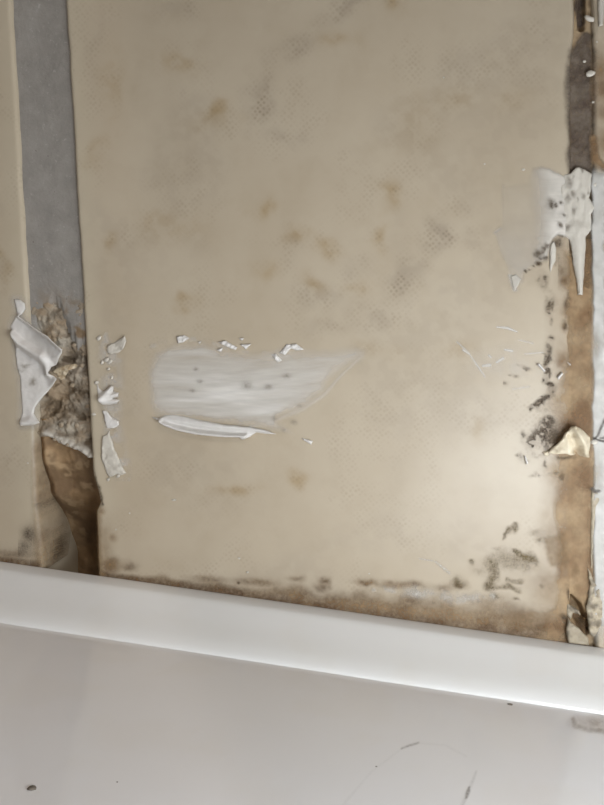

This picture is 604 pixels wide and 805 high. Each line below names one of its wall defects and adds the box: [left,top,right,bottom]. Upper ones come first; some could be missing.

water stain [566,0,604,178]
peeling [52,364,77,380]
water stain [529,337,563,410]
water stain [522,417,558,447]
peeling [543,426,591,458]